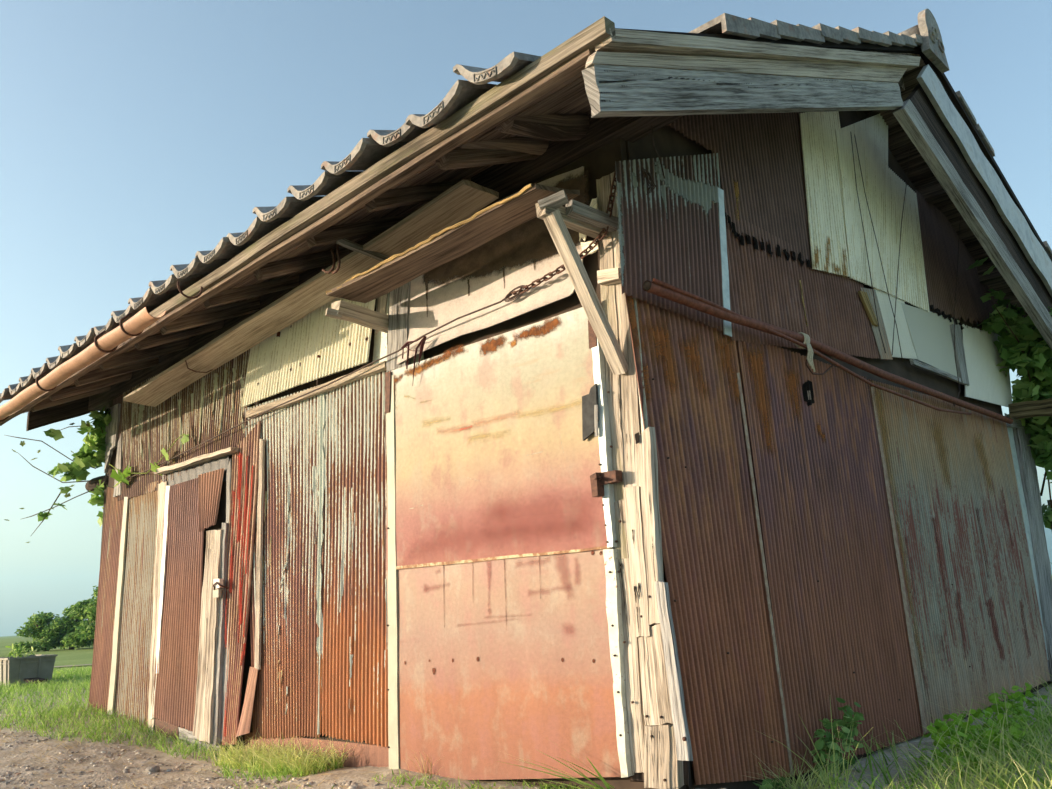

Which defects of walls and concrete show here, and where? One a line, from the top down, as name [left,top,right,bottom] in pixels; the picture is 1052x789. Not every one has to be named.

peeling [616,172,638,286]
peeling [655,160,719,216]
corrosion [814,238,846,276]
corrosion [394,345,464,399]
corrosion [480,317,561,355]
corrosion [628,295,705,400]
peeling [278,474,291,639]
peeling [312,393,326,734]
peeling [340,487,355,612]